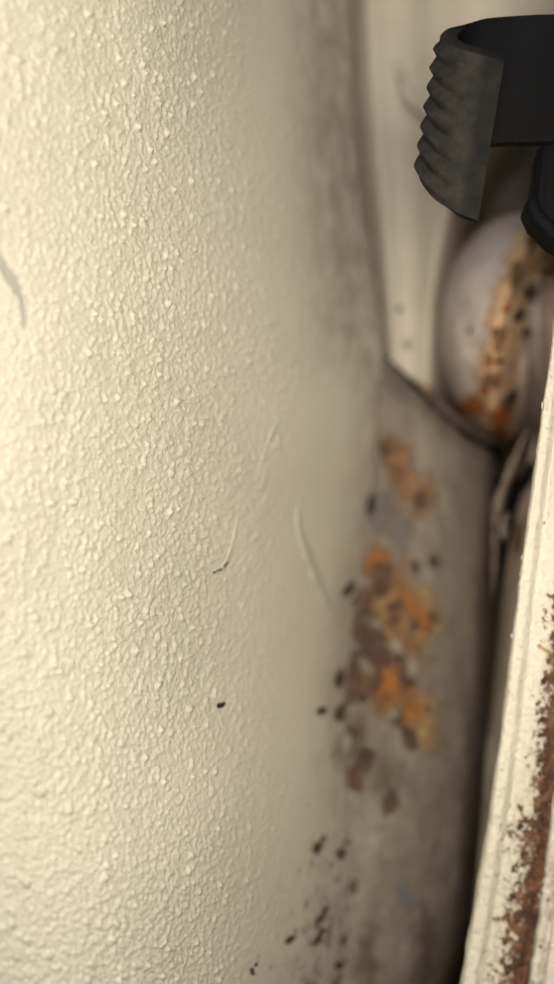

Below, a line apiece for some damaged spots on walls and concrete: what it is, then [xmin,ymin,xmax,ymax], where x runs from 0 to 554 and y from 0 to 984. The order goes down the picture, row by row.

rust [455,228,554,446]
rust [379,435,438,520]
rust [346,544,439,750]
rust [478,582,554,984]